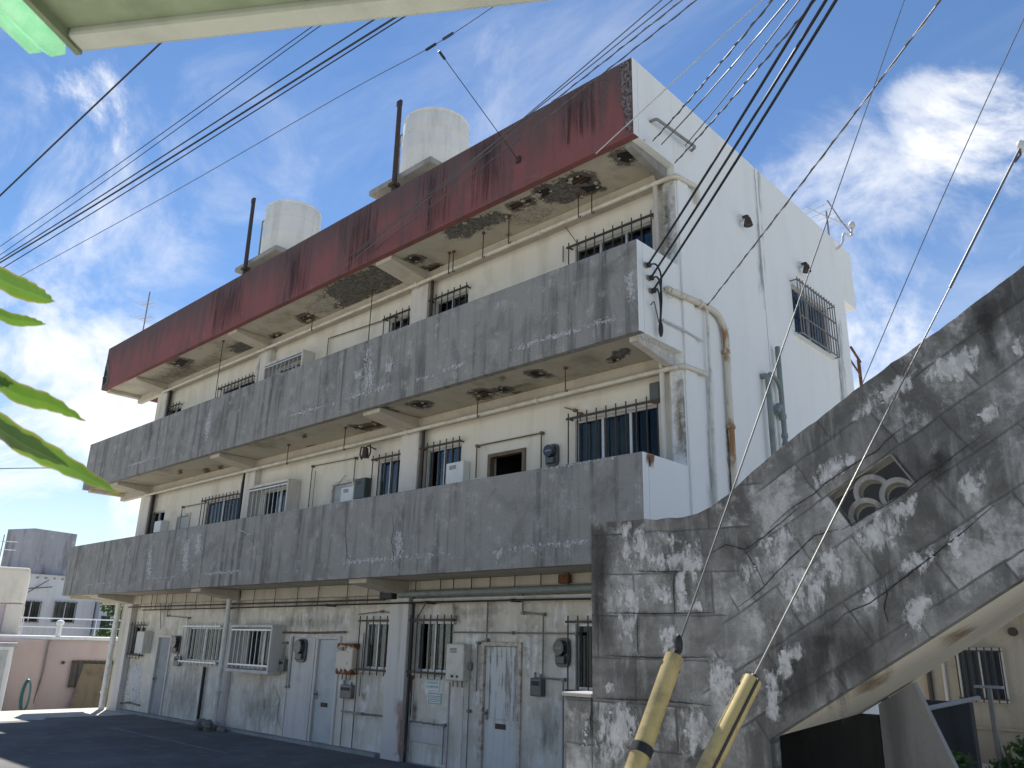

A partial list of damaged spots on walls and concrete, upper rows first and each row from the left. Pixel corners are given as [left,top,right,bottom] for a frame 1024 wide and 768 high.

peeling [620,60,633,133]
spalling [608,148,637,166]
spalling [443,170,607,241]
peeling [295,265,403,323]
spalling [467,386,514,400]
spalling [524,369,551,379]
water stain [510,315,615,352]
peeling [606,348,630,363]
crack [610,422,994,659]
water stain [493,531,605,609]
water stain [776,624,871,702]